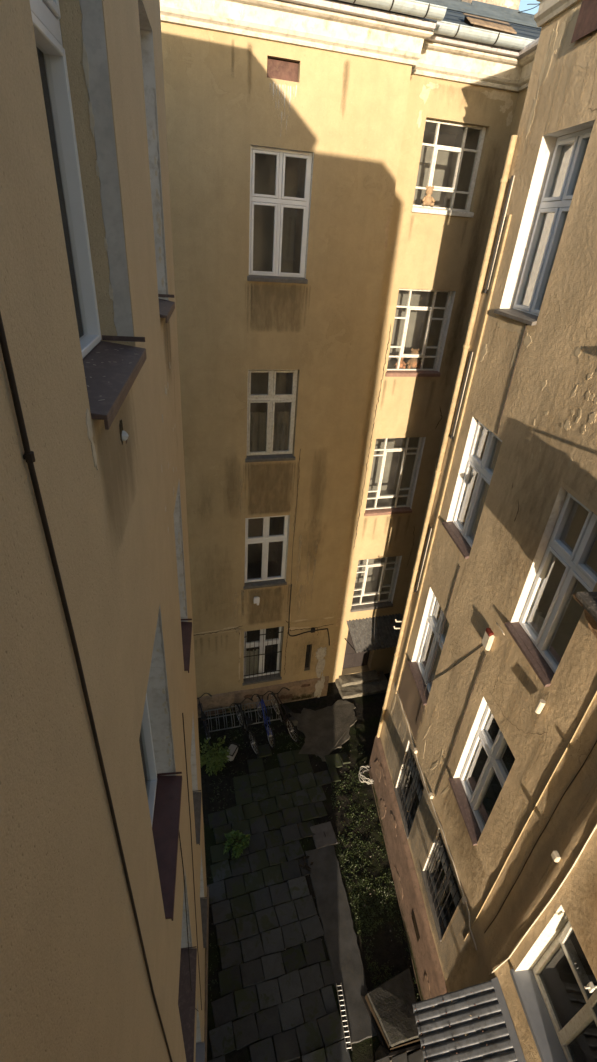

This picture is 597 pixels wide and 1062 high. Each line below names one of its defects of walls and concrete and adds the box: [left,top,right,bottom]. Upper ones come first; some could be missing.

peeling [79,0,134,342]